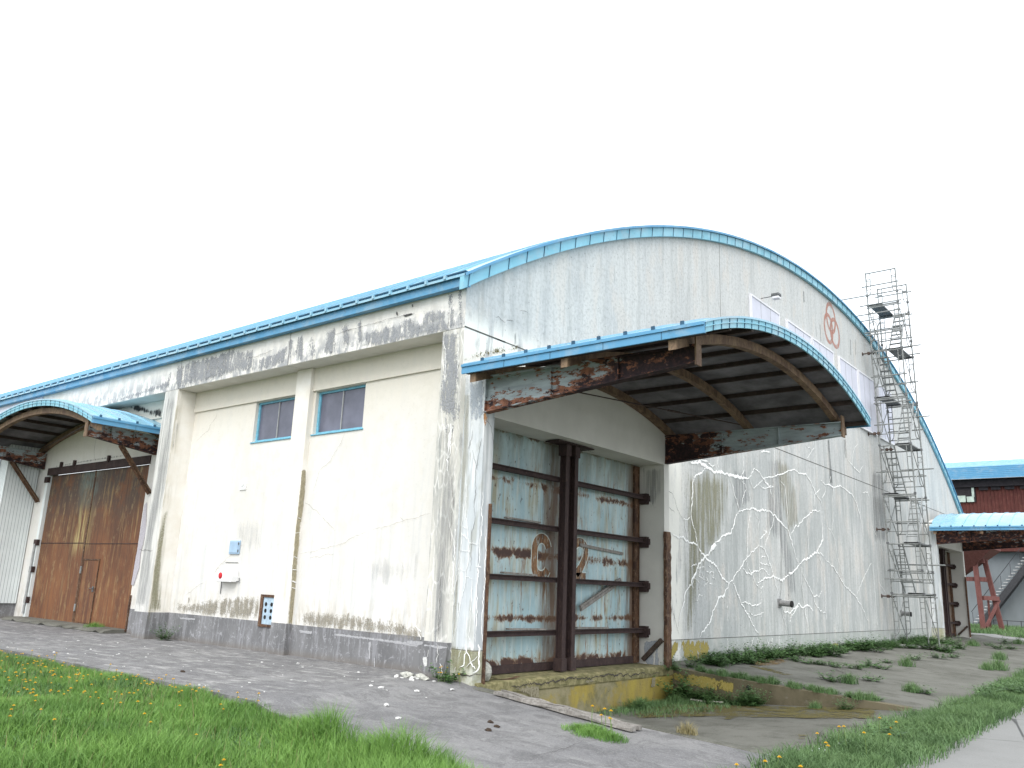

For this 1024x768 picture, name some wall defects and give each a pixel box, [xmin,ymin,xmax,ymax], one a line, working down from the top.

damp [121,290,462,433]
damp [177,597,258,618]
damp [304,611,421,640]
crack [292,421,494,677]
crack [669,439,885,637]